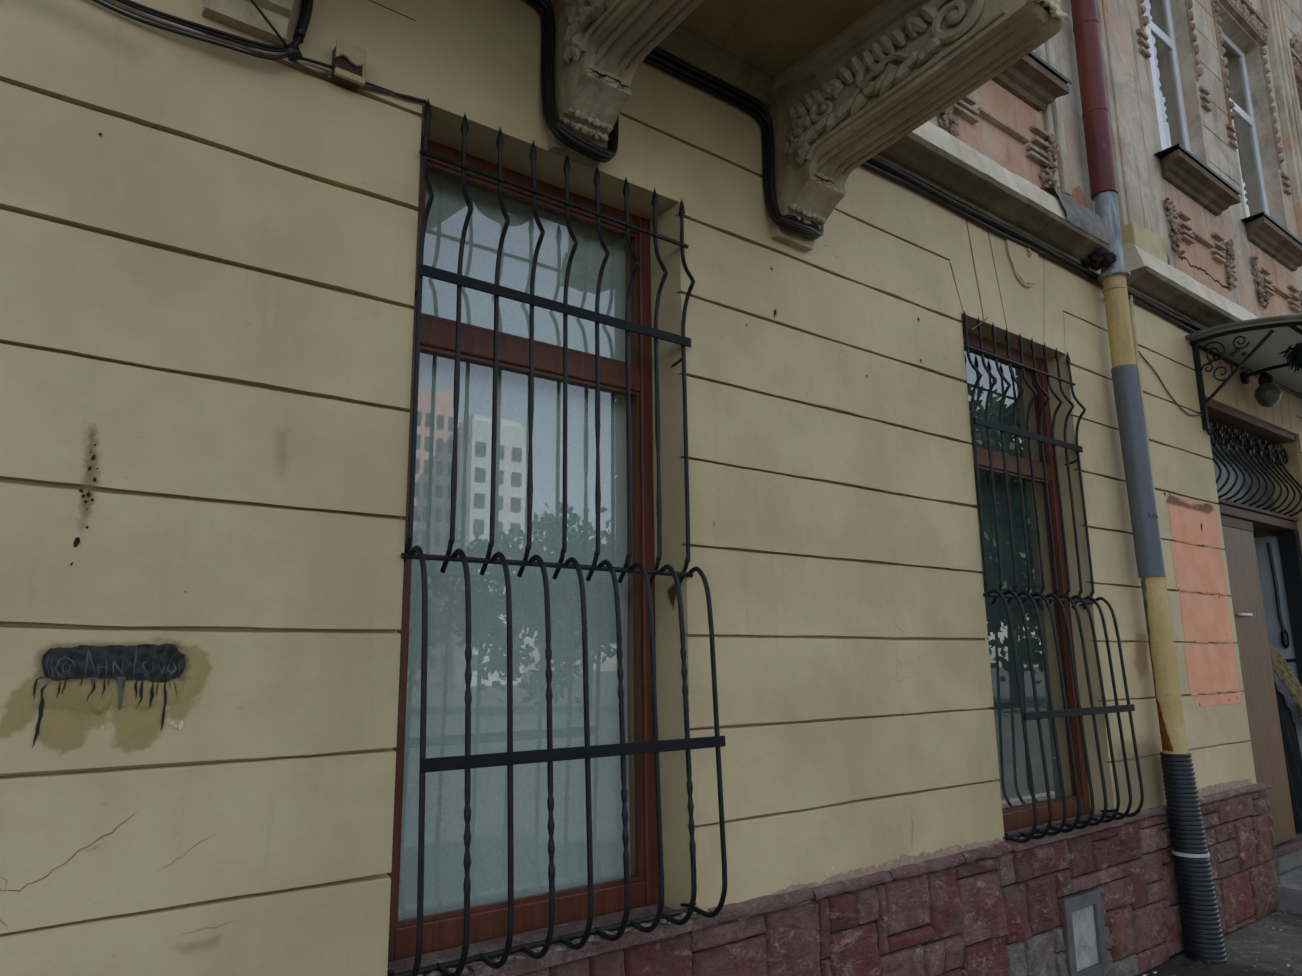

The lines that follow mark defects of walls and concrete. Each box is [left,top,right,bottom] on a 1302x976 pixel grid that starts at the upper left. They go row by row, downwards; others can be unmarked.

water stain [79,444,98,510]
crack [0,812,136,927]